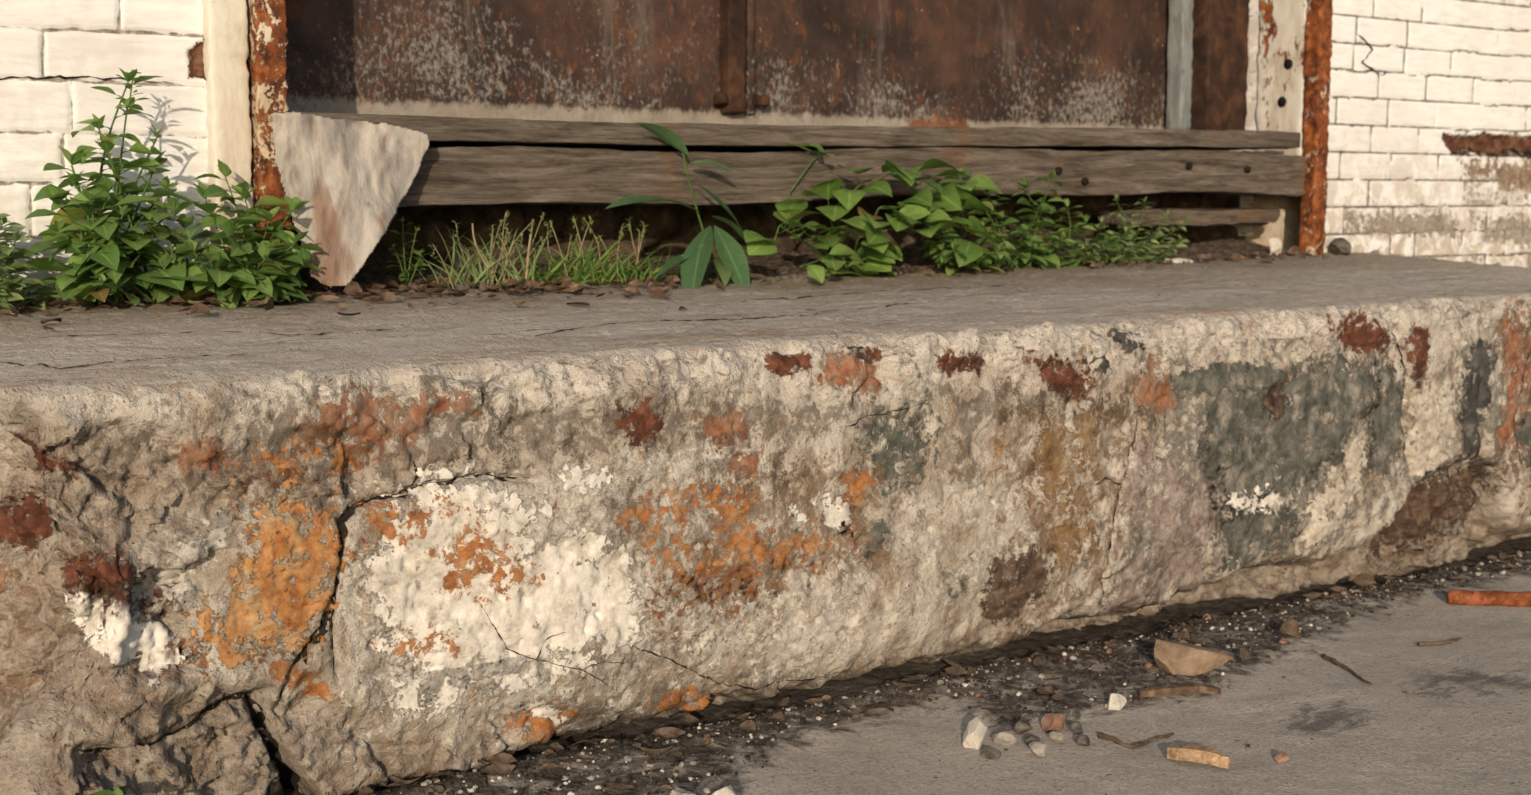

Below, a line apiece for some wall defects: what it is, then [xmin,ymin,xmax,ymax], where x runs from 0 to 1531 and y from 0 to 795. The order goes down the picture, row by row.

spalling [1441,130,1531,159]
corrosion [166,382,546,609]
corrosion [603,397,667,459]
corrosion [614,404,887,639]
corrosion [1493,310,1531,459]
crack [78,456,527,795]
corrosion [370,623,462,670]